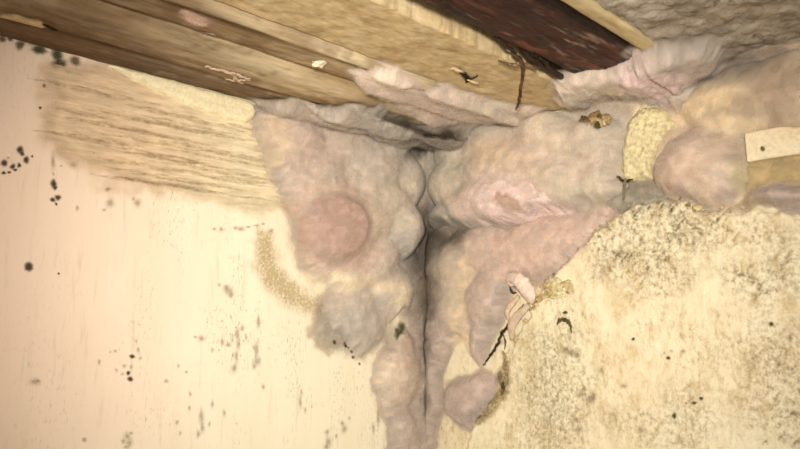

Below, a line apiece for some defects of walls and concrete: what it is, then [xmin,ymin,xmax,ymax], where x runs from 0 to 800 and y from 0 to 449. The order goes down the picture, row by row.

damp [33,46,79,66]
damp [2,147,33,174]
crack [483,286,524,365]